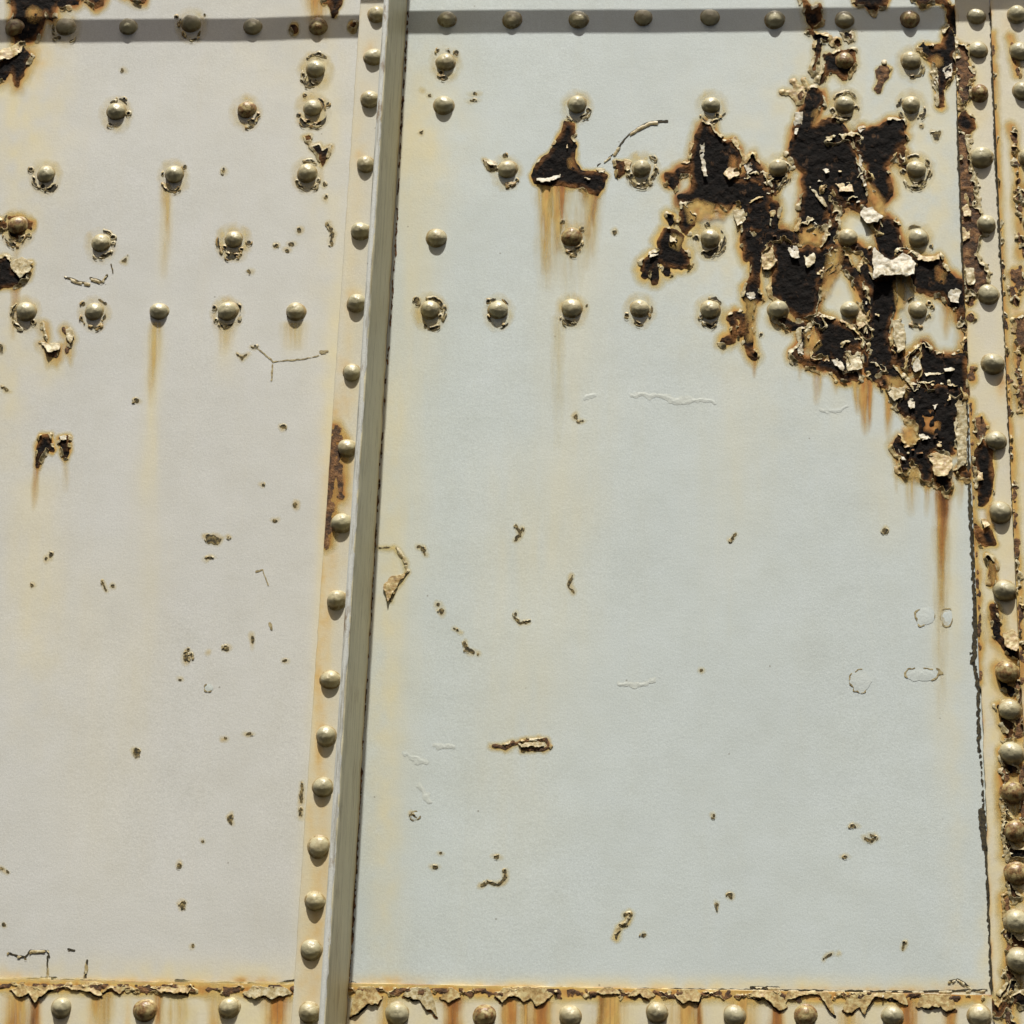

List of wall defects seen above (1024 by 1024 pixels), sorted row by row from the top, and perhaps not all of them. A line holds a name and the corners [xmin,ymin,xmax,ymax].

corrosion [0,0,109,90]
corrosion [529,120,632,250]
peeling [626,154,659,190]
peeling [692,221,726,258]
corrosion [0,253,34,293]
crack [257,348,329,381]
corrosion [633,0,1024,863]
corrosion [34,432,72,483]
corrosion [324,421,350,550]
peeling [378,546,410,602]
peeling [0,977,294,1024]
peeling [348,983,987,1024]